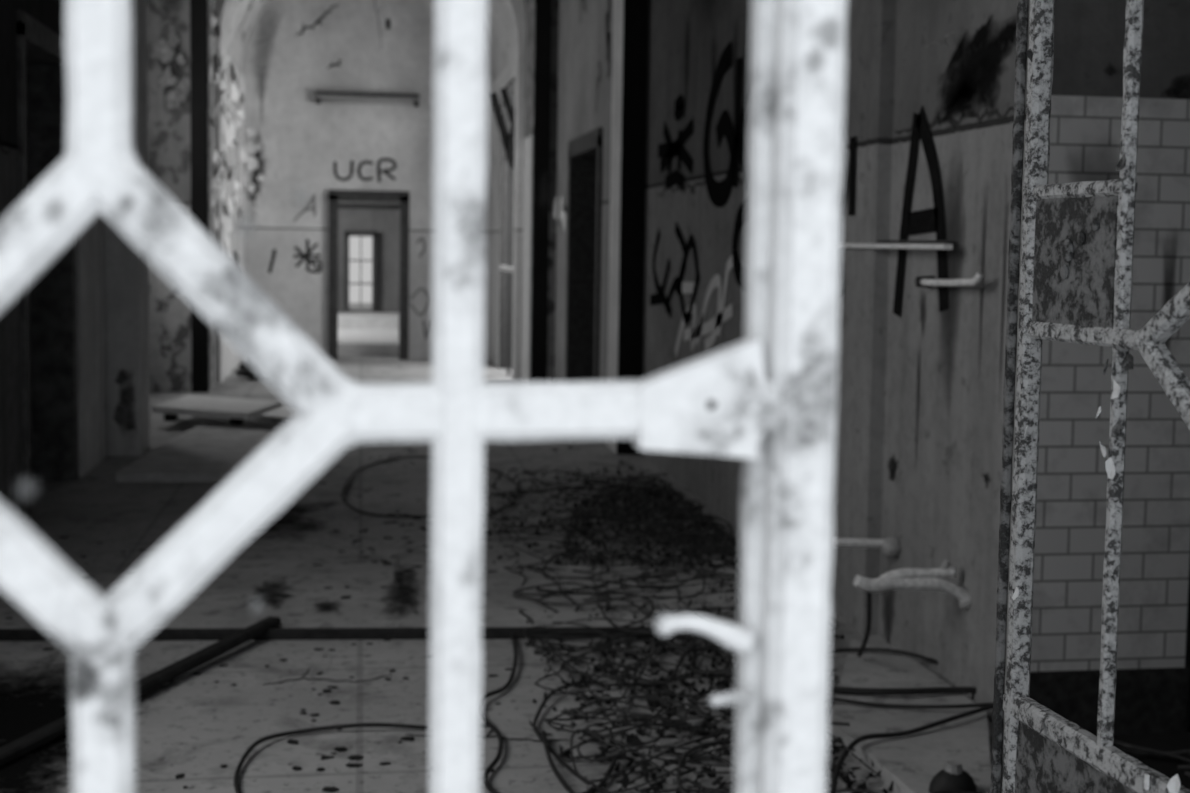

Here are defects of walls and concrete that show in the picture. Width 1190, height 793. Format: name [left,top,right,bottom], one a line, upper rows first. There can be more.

flaking render [152,33,190,108]
peeling [209,5,265,264]